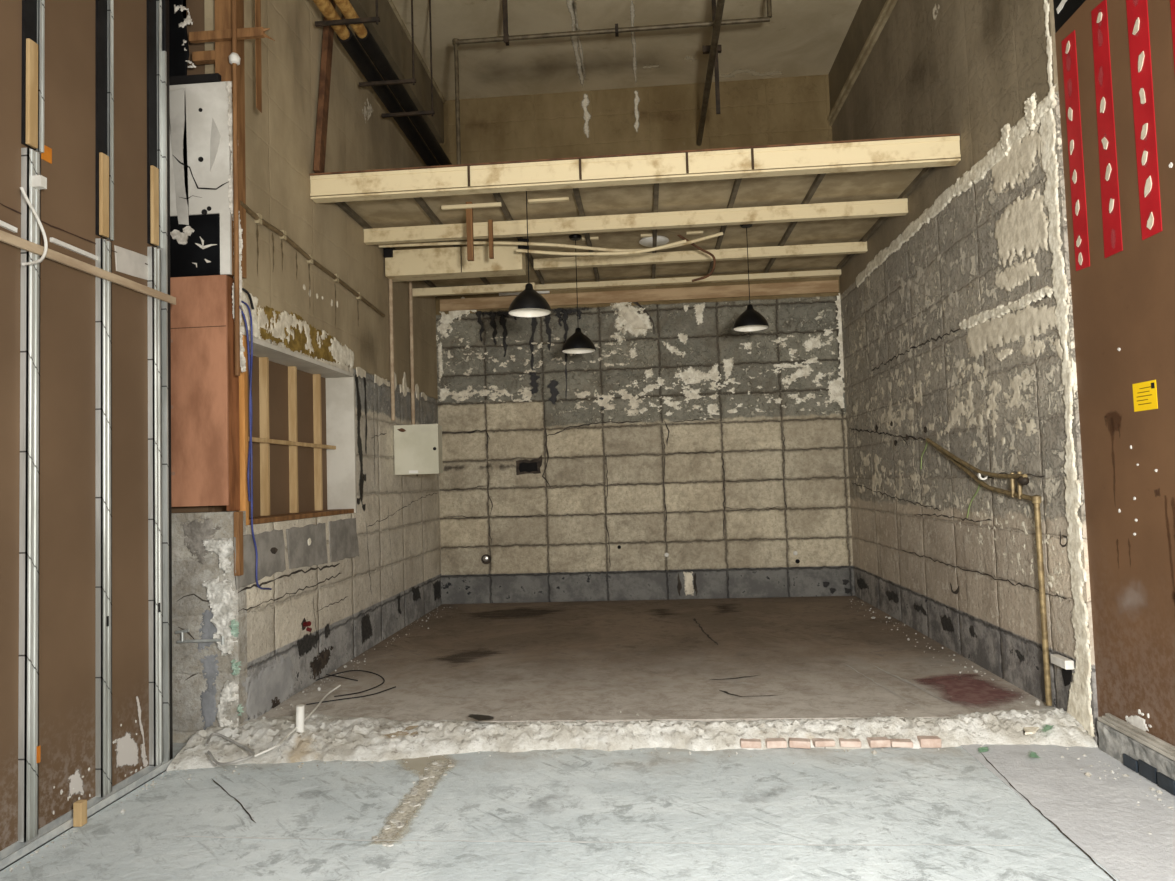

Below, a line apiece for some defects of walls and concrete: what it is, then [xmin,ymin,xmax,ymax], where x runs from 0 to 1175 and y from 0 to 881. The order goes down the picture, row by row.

crack [173,155,229,199]
peeling [356,297,574,402]
leakage [476,311,517,357]
leakage [529,307,592,397]
peeling [574,293,845,420]
peeling [855,0,1095,737]
peeling [180,516,359,730]
peeling [683,572,694,596]